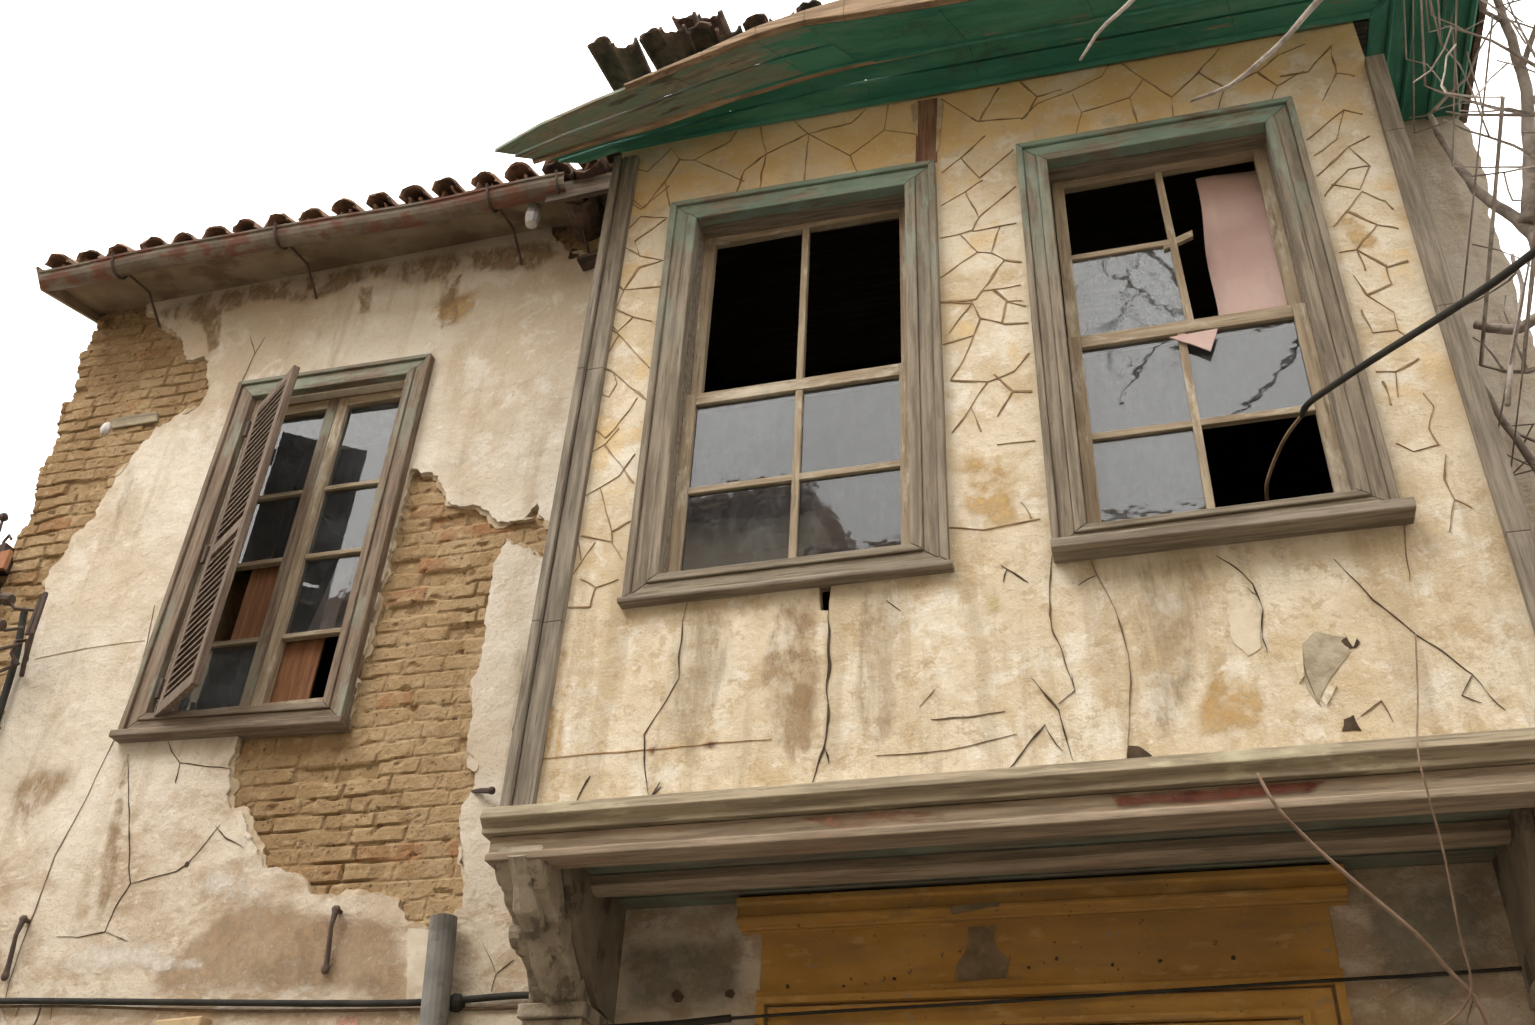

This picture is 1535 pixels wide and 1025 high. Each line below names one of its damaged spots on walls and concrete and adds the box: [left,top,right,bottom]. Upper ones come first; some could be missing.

crack [36,605,155,660]
flaking render [0,307,210,731]
flaking render [228,471,549,930]
crack [543,604,769,800]
crack [812,611,831,783]
crack [876,557,1132,767]
crack [1216,555,1268,652]
spalling [1294,631,1357,706]
peeling [1342,715,1361,731]
crack [1361,700,1394,723]
crack [1334,559,1505,710]
crack [3,708,241,1025]